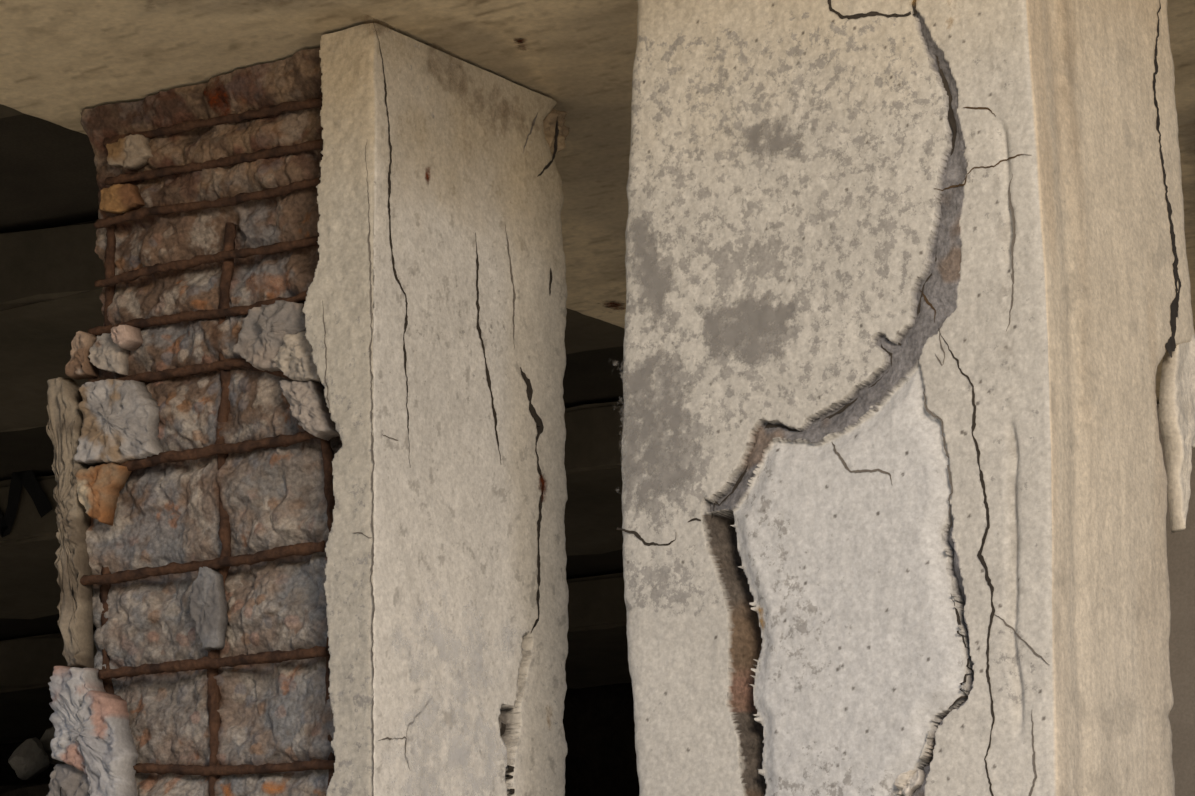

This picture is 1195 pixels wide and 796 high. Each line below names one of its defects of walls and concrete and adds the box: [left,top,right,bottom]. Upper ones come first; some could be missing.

spalling [46,48,342,796]
crack [475,233,501,460]
crack [498,224,544,795]
crack [547,268,555,294]
crack [616,0,1049,796]
crack [1153,0,1181,358]